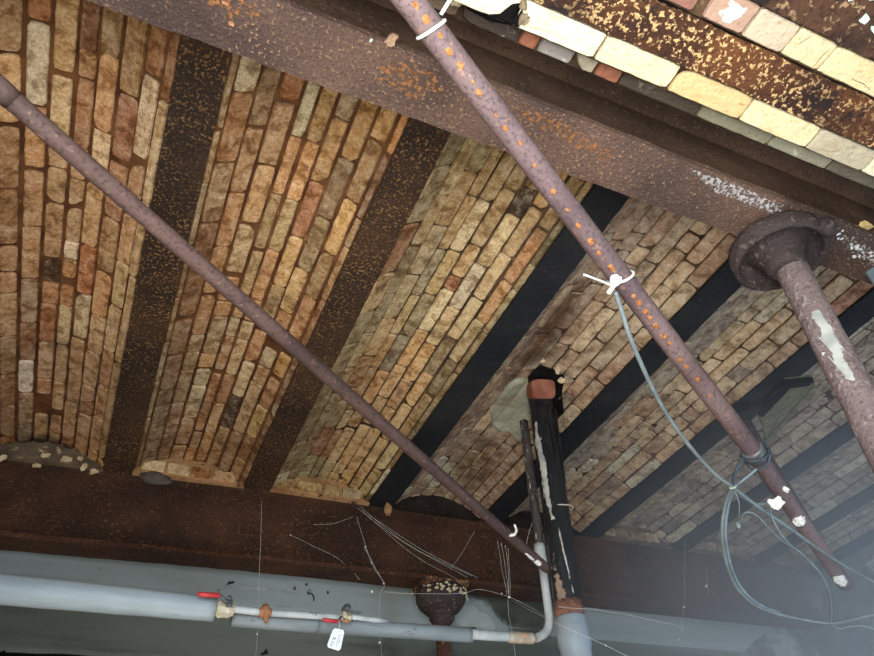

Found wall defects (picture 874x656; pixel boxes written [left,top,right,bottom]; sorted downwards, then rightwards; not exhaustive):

corrosion [412,1,431,25]
peeling [719,0,748,23]
corrosion [384,33,399,47]
corrosion [438,32,464,71]
corrosion [378,56,444,99]
corrosion [533,0,874,149]
corrosion [515,106,610,164]
leakage [693,170,781,212]
spalling [526,358,566,417]